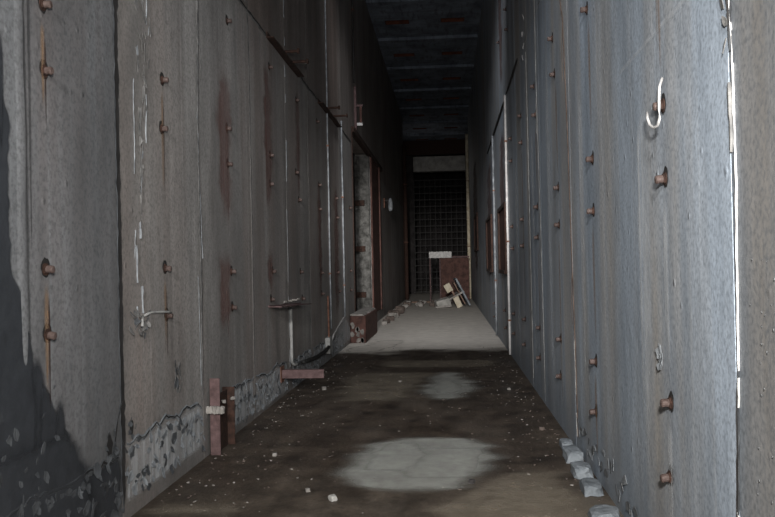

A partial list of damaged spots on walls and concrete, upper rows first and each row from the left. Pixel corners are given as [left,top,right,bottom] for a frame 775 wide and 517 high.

peeling [232,333,345,425]